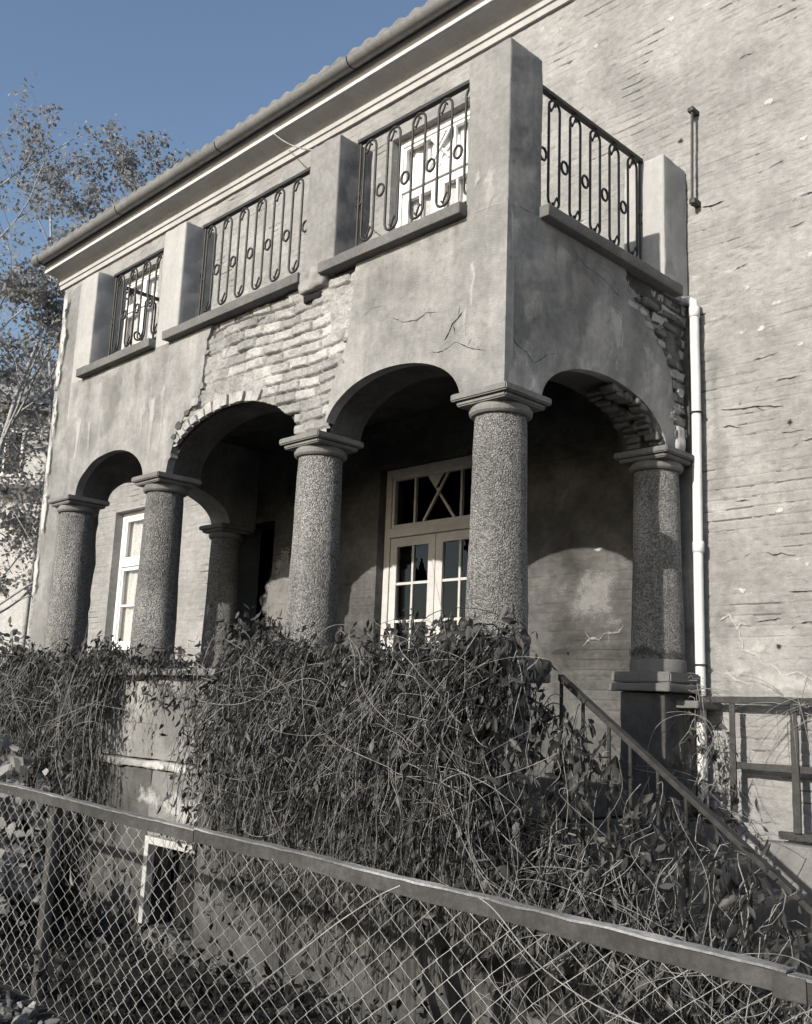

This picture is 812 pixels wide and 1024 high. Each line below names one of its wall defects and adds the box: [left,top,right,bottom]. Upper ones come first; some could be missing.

spalling [170,271,355,446]
crack [372,305,483,353]
spalling [626,271,687,452]